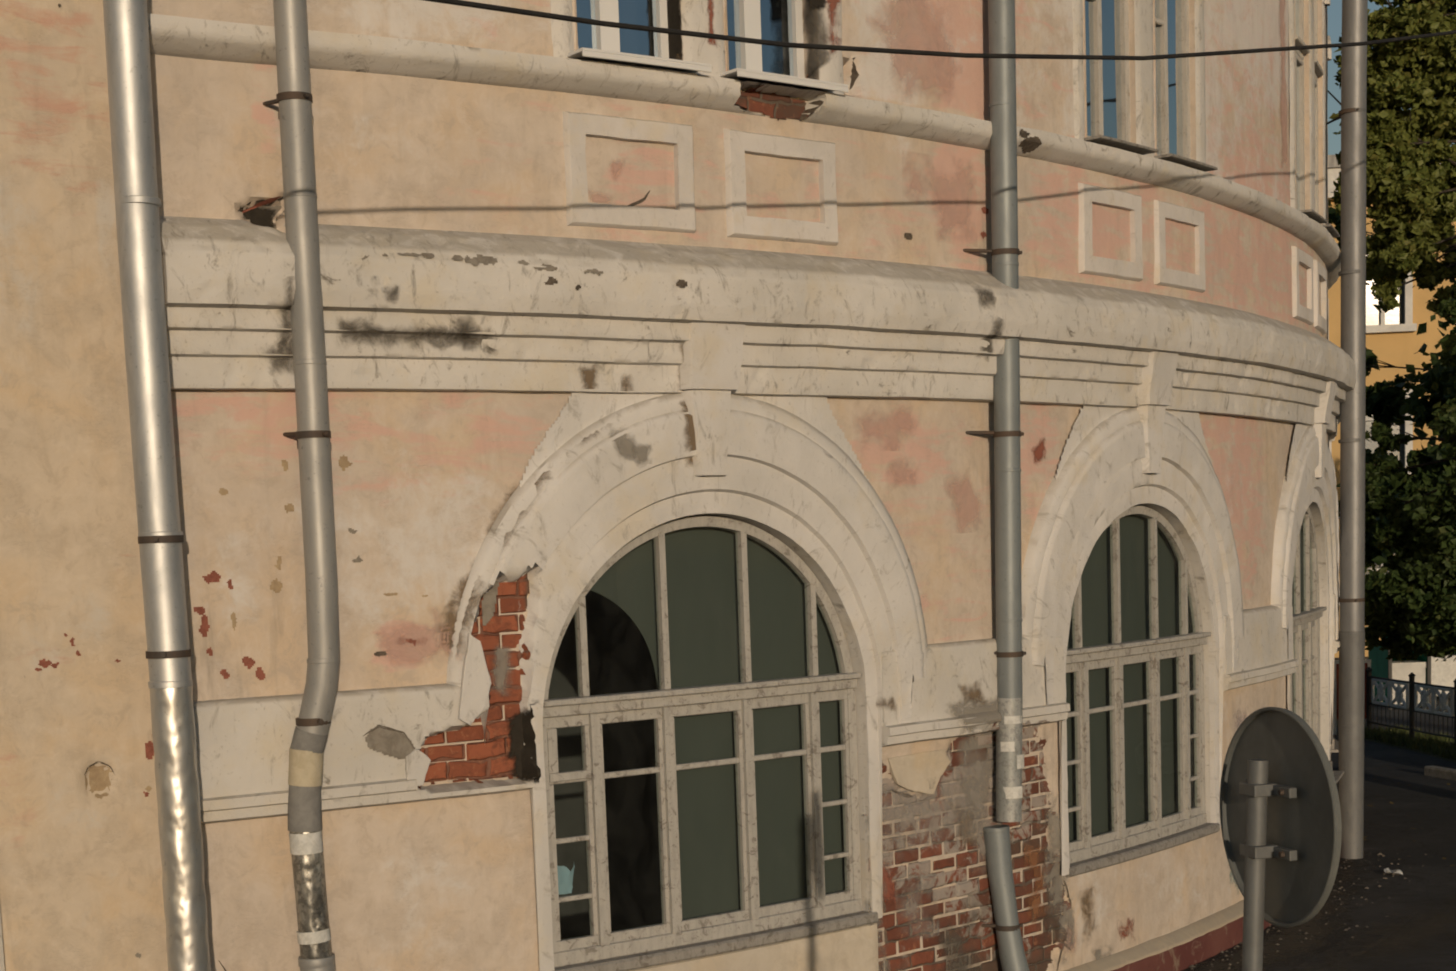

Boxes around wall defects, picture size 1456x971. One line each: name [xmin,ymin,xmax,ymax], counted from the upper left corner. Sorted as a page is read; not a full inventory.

spalling [734,83,824,121]
hole [240,196,285,229]
leakage [340,321,494,351]
flaking render [338,455,352,471]
peeling [202,571,233,589]
flaking render [270,556,283,593]
peeling [194,607,265,680]
flaking render [363,573,541,789]
flaking render [84,762,115,799]
flaking render [864,720,1093,971]